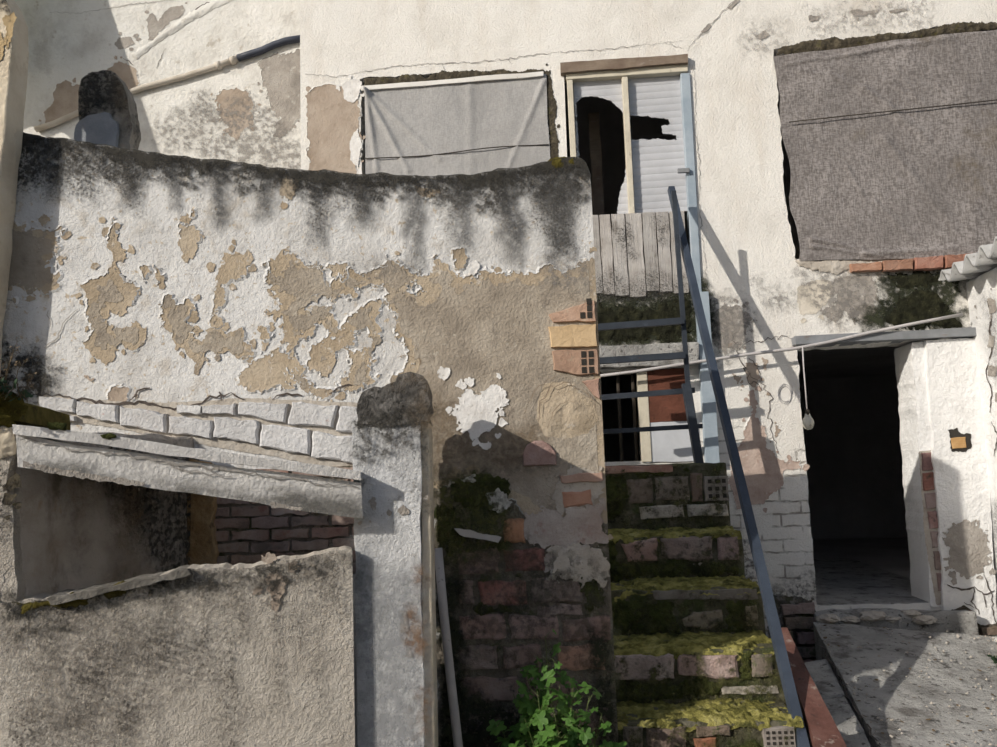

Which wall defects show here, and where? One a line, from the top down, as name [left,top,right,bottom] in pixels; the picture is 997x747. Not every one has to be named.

peeling [5,214,72,311]
spalling [0,427,144,521]
water stain [17,91,591,285]
peeling [73,208,618,747]
peeling [210,48,560,174]
water stain [349,366,532,468]
crack [307,1,734,277]
water stain [596,269,753,362]
flaking render [728,357,810,513]
water stain [799,270,969,332]
crack [986,301,997,454]
water stain [0,553,364,747]